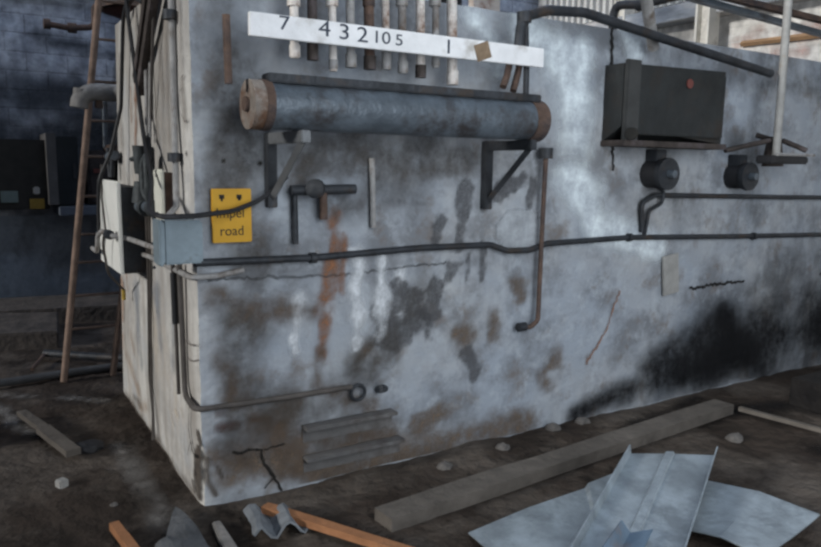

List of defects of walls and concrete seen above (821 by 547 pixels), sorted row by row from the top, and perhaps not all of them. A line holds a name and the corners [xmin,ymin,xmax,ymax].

damp [289,294,303,353]
damp [349,248,405,378]
damp [672,352,759,389]
damp [410,404,447,434]